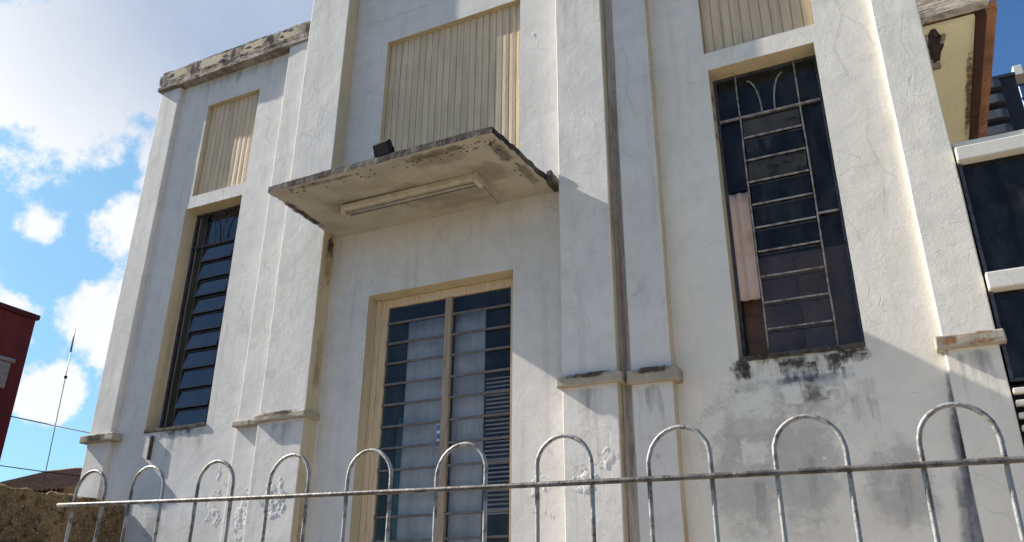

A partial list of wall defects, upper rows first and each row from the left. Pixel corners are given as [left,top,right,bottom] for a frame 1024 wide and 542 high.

peeling [167,28,302,80]
water stain [730,347,869,379]
peeling [230,477,285,542]
peeling [564,446,615,497]
water stain [722,414,833,522]
water stain [870,449,934,520]